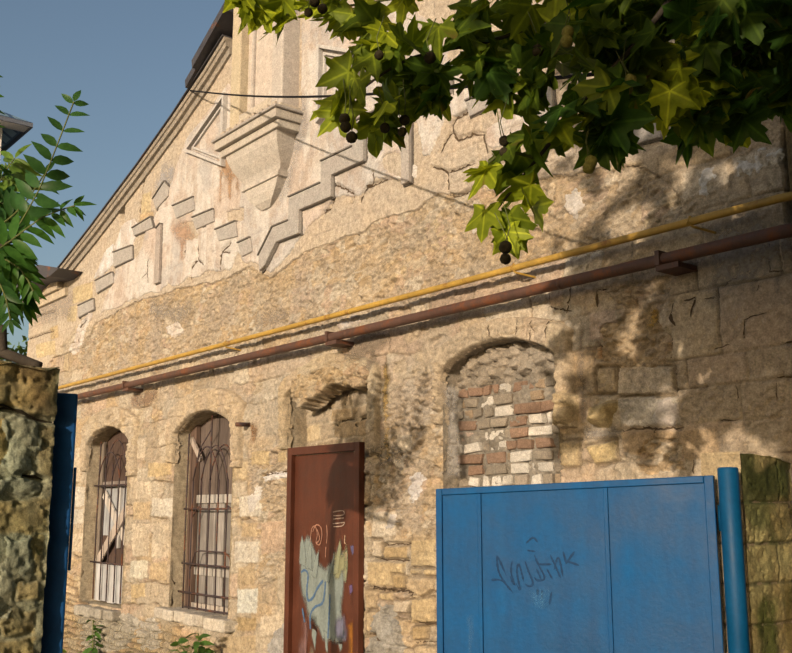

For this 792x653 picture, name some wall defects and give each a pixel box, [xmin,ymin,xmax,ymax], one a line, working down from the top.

flaking render [381,0,428,32]
spalling [68,11,682,383]
flaking render [698,167,717,196]
crack [0,403,53,423]